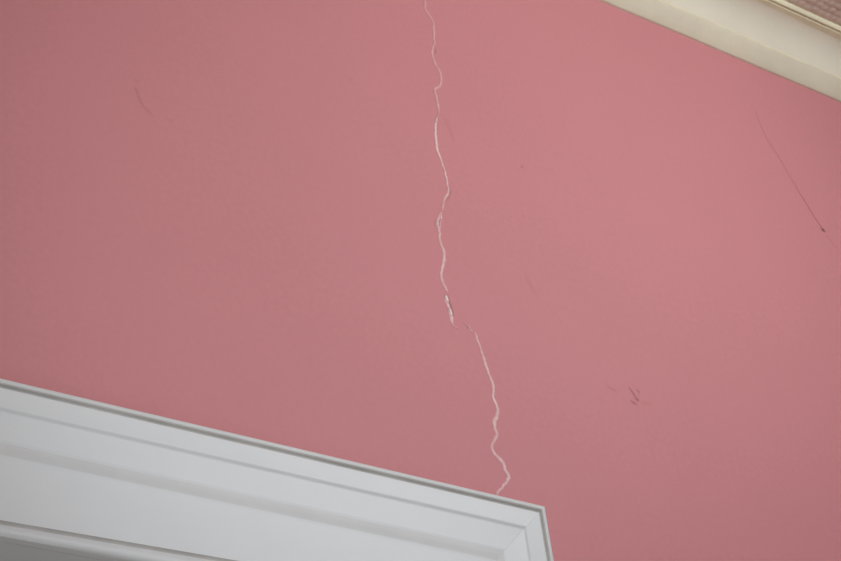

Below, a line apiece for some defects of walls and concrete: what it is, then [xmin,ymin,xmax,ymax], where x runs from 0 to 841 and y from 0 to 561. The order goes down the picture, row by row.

crack [423,0,511,495]